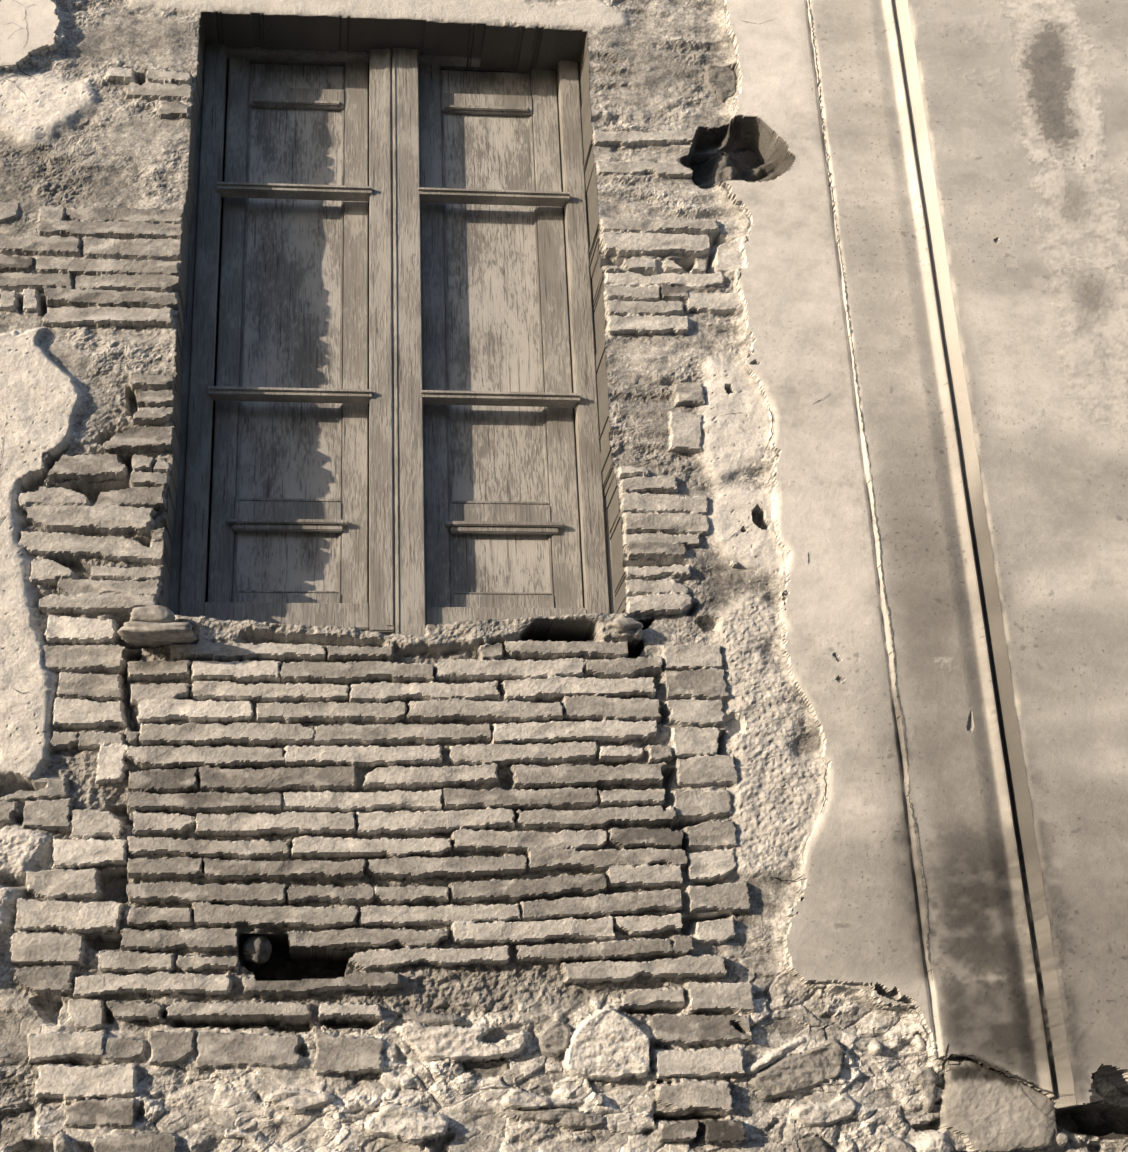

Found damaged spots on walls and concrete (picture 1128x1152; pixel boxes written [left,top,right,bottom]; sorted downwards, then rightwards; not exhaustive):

crack [0,0,55,96]
spalling [0,0,355,238]
spalling [483,0,754,286]
spalling [678,115,795,189]
leakage [1000,0,1128,430]
spalling [0,206,1078,1152]
spalling [986,1064,1128,1152]